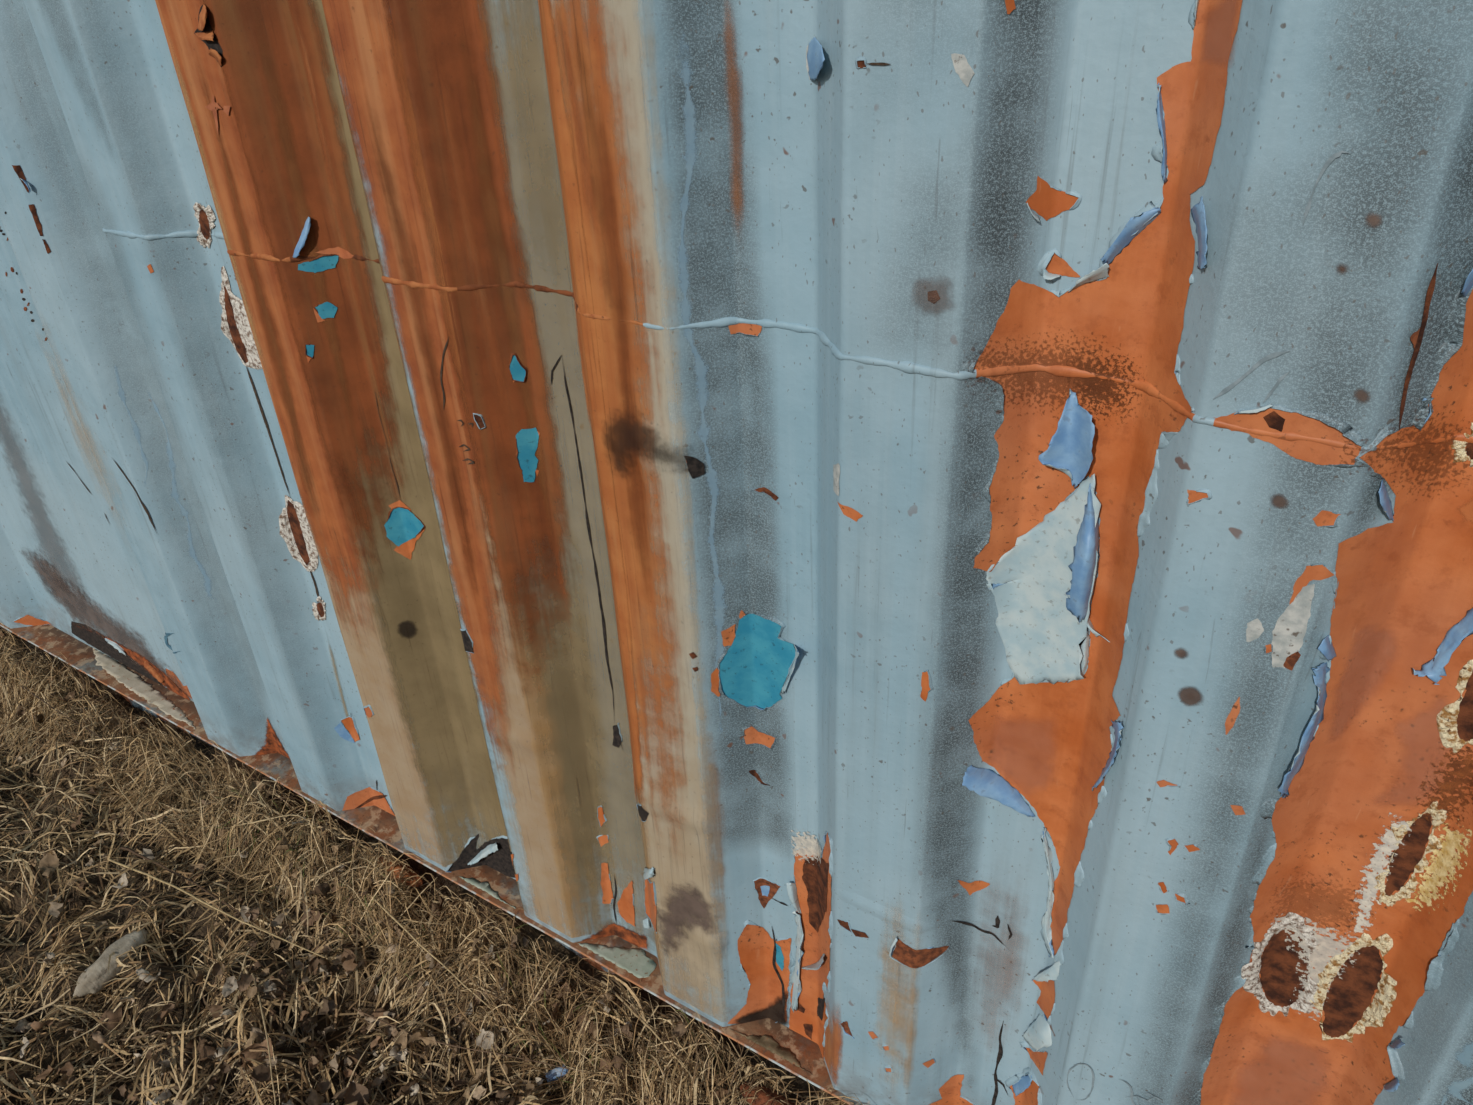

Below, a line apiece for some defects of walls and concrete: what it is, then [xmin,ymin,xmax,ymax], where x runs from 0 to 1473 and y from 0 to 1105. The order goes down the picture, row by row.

corrosion [726,29,741,212]
peeling [293,217,354,273]
corrosion [155,0,720,989]
peeling [956,0,1242,1105]
corrosion [1451,422,1473,467]
corrosion [71,621,190,701]
peeling [689,610,800,711]
peeling [1190,269,1473,1105]
corrosion [1374,660,1473,907]
peeling [728,830,894,1073]
corrosion [1241,912,1397,1043]
peeling [929,1074,974,1105]